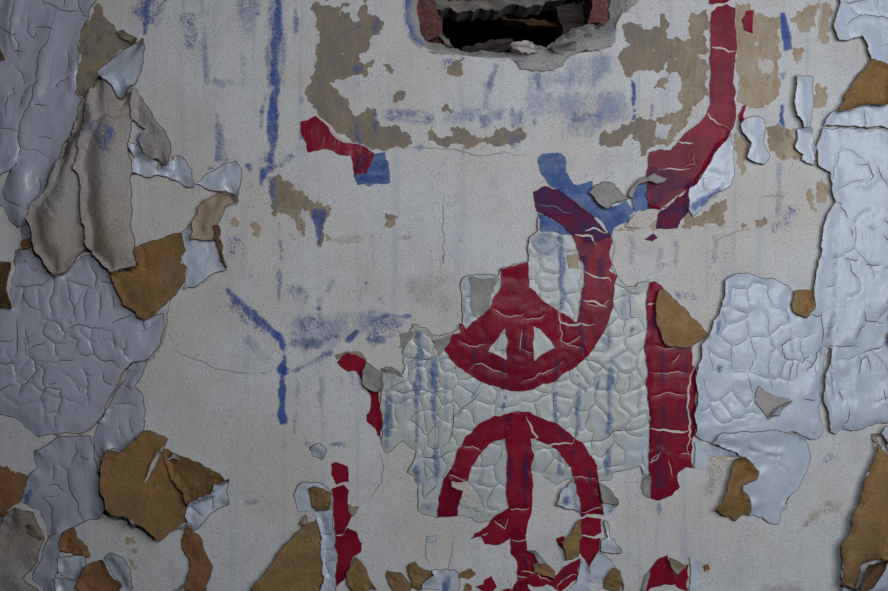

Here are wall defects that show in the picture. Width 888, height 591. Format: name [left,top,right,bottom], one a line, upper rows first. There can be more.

peeling [0,0,261,591]
spalling [305,0,413,151]
peeling [380,0,888,591]